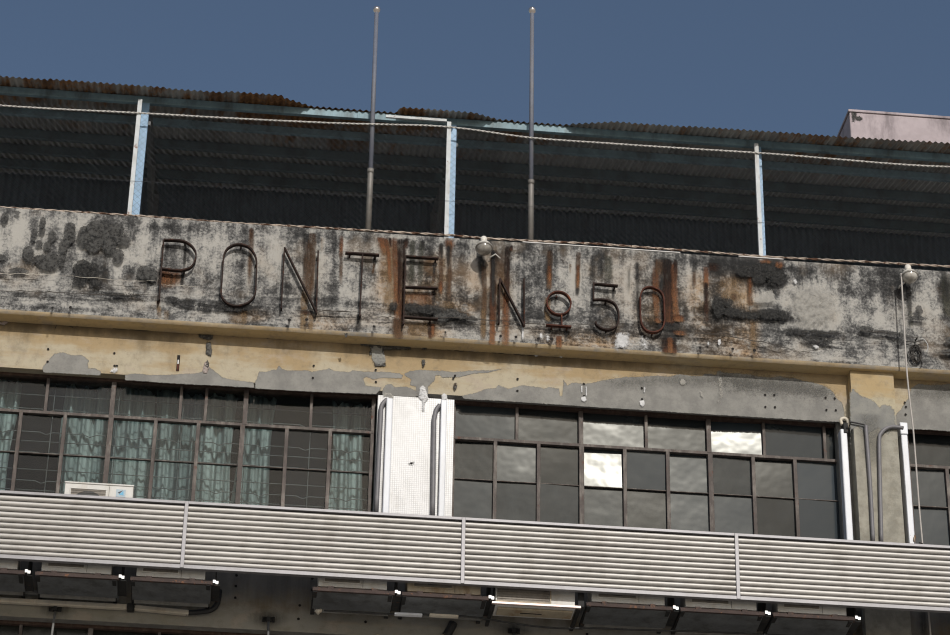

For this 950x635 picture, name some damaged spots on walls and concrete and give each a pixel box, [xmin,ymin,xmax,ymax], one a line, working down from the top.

water stain [0,215,142,298]
peeling [43,352,101,375]
corrosion [372,237,453,338]
corrosion [478,245,513,345]
peeling [125,334,950,445]
corrosion [653,258,685,353]
water stain [711,293,842,345]
water stain [858,326,904,337]
water stain [903,283,929,322]